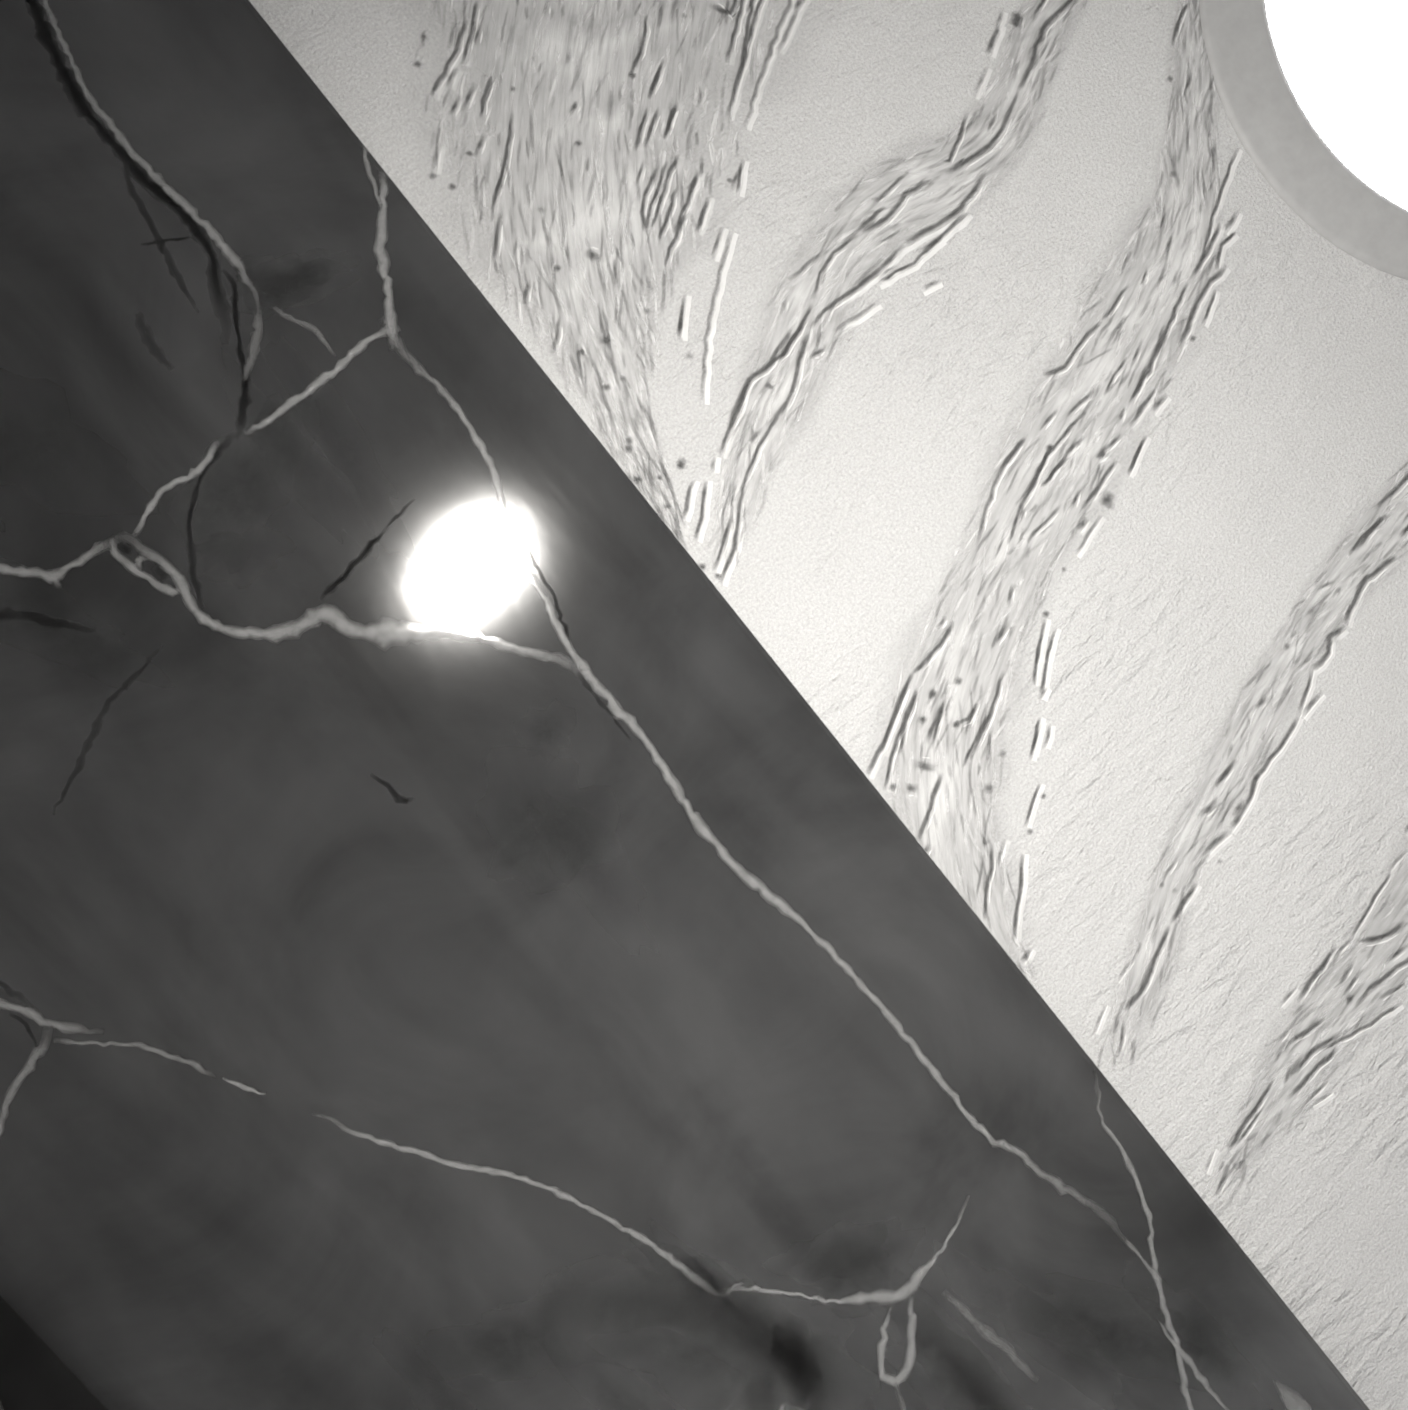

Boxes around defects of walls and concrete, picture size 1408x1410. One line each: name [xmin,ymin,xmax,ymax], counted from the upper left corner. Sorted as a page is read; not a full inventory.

crack [27,0,390,423]
crack [144,466,203,516]
crack [323,537,380,625]
crack [517,547,569,646]
crack [765,1242,947,1383]